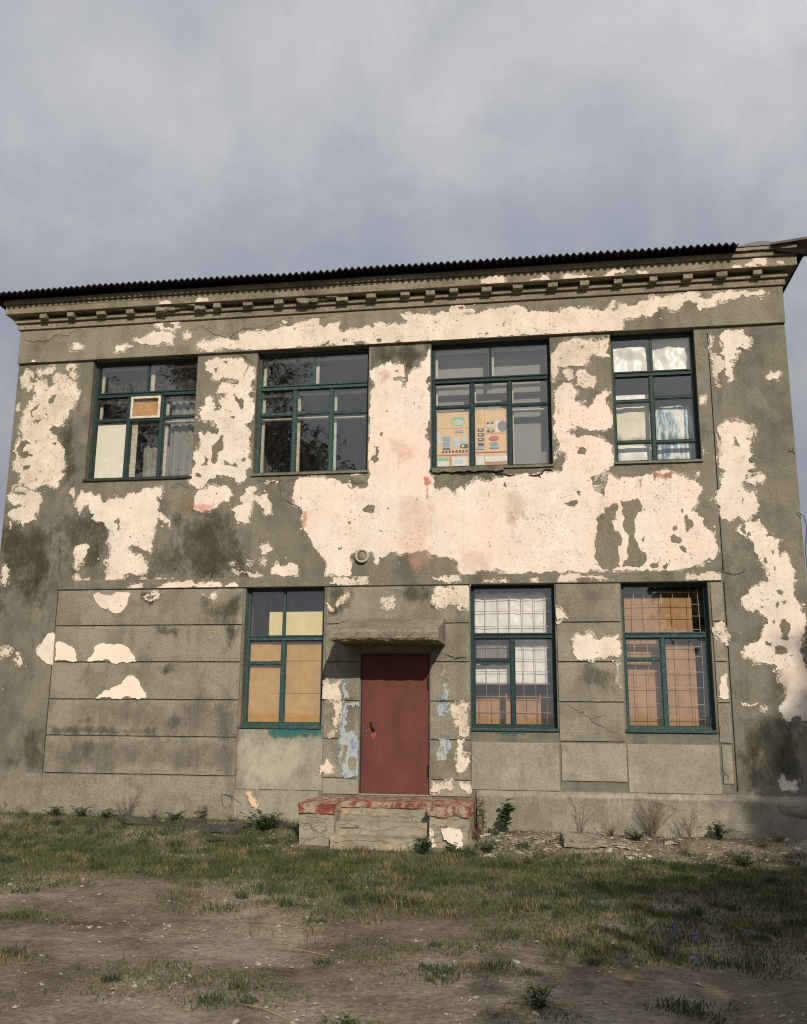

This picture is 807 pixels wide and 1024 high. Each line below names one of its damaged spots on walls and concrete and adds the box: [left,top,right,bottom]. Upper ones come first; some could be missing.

water stain [0,528,49,597]
peeling [7,342,301,613]
water stain [151,524,241,569]
peeling [114,288,807,726]
peeling [0,632,147,699]
peeling [316,678,359,780]